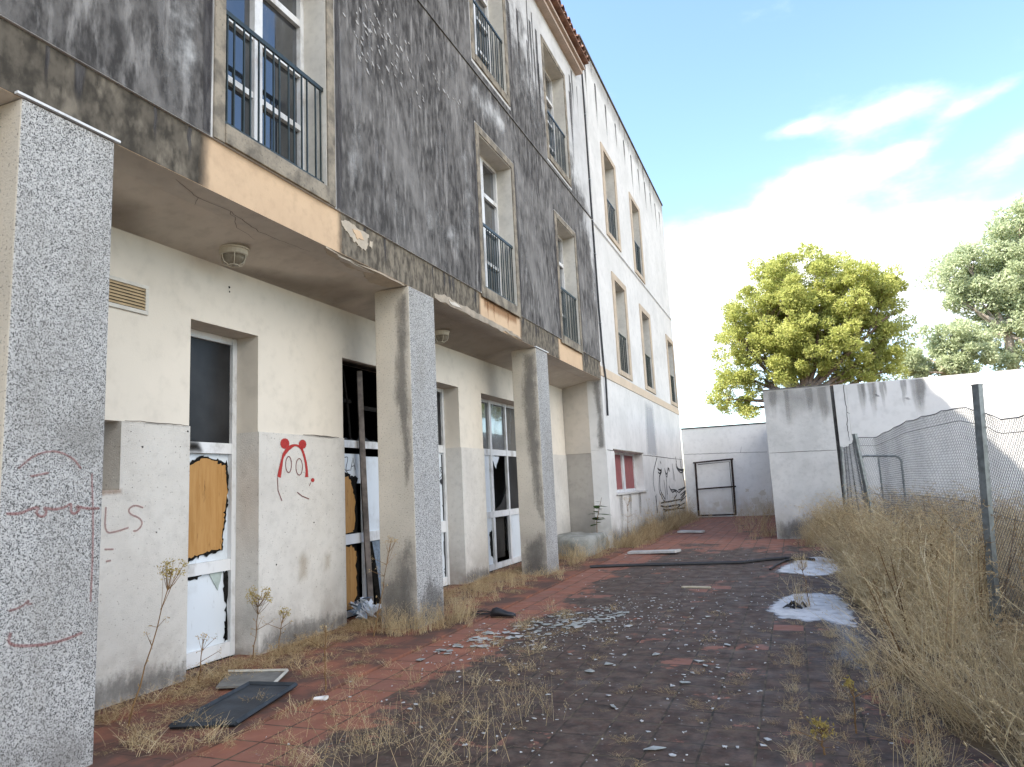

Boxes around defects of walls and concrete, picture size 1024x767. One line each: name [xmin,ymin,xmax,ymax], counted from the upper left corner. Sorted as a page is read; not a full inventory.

water stain [0,0,213,186]
peeling [342,0,461,109]
flaking render [341,220,373,251]
water stain [334,0,601,379]